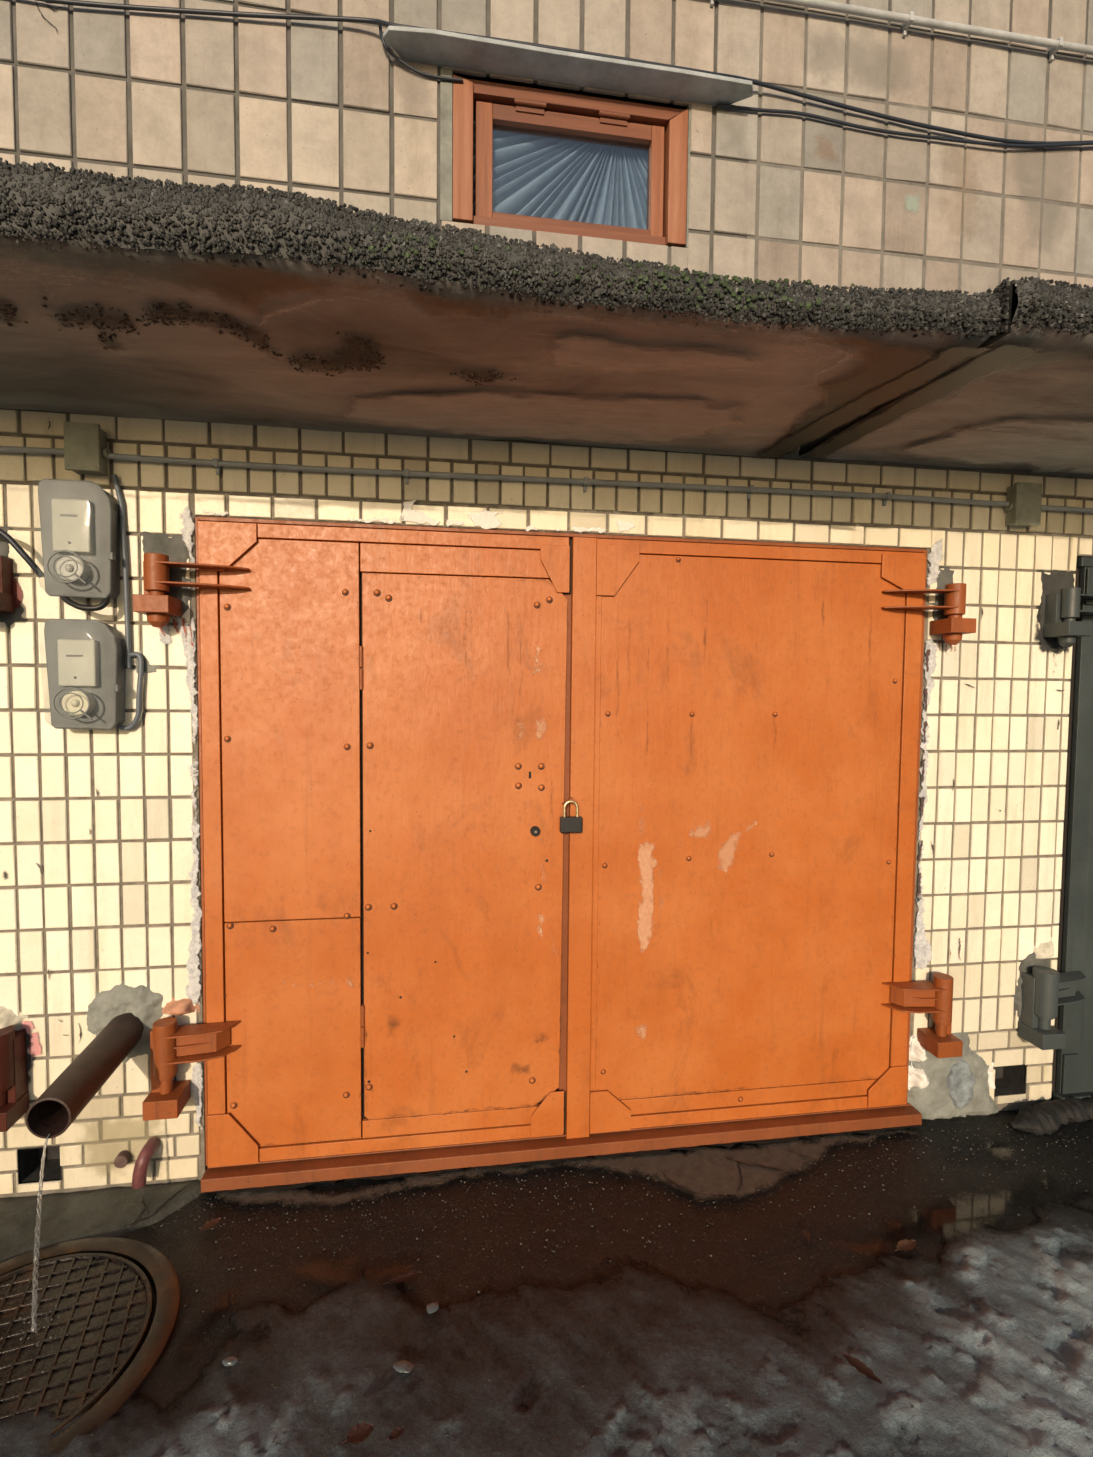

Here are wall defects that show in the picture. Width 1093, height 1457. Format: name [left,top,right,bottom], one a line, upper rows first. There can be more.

leakage [0,246,366,324]
leakage [754,338,1093,459]
peeling [179,506,228,563]
peeling [348,500,502,529]
peeling [526,520,634,533]
peeling [927,539,943,585]
peeling [159,616,198,743]
peeling [914,639,938,969]
peeling [185,761,202,1005]
peeling [190,1063,203,1132]